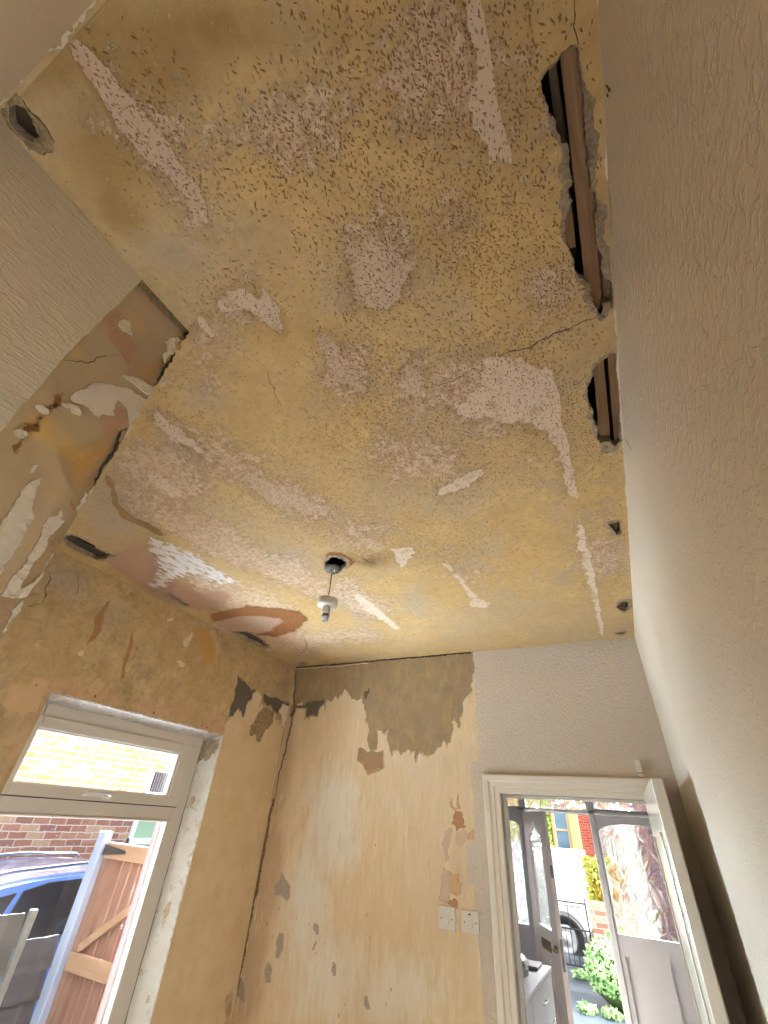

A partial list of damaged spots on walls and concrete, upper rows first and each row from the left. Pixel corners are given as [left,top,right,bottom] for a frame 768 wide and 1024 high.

flaking render [0,92,55,155]
flaking render [539,44,613,322]
flaking render [162,330,189,363]
crack [499,317,595,356]
flaking render [585,352,622,454]
flaking render [64,534,116,561]
peeling [148,537,236,607]
flaking render [228,630,270,649]
peeling [229,652,475,776]
crack [235,630,472,1002]
flaking render [439,795,474,909]